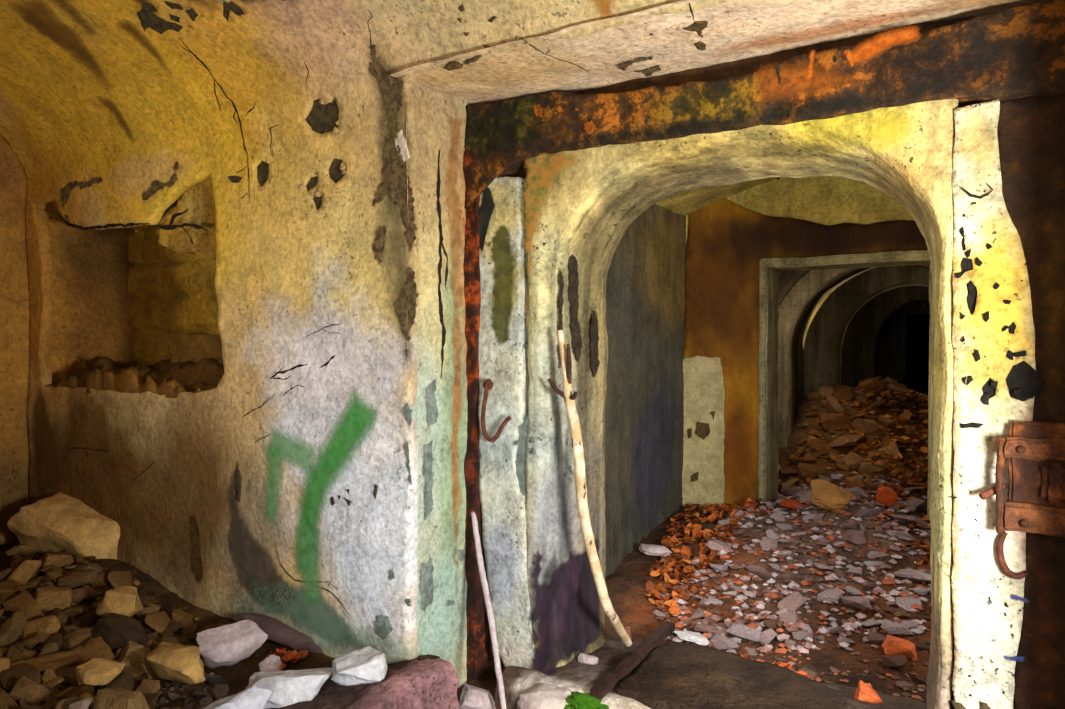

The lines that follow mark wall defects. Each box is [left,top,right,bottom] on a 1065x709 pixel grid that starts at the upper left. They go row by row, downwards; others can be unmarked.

rust [597,0,608,19]
rust [761,28,917,99]
crack [181,41,278,202]
spalling [257,161,269,191]
spalling [305,98,339,134]
spalling [298,158,346,210]
flaking render [368,45,417,252]
crack [57,207,209,244]
flaking render [372,226,387,265]
flaking render [955,227,992,322]
flaking render [393,267,420,357]
spalling [962,350,1043,405]